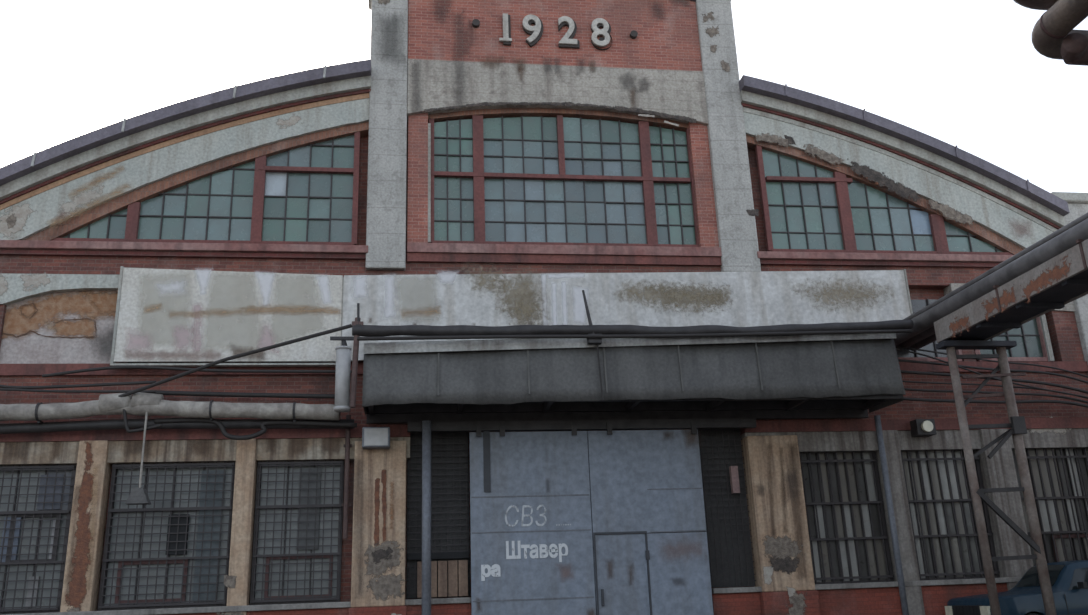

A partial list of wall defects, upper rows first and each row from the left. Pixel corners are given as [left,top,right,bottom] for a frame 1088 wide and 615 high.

spalling [702,12,730,72]
spalling [755,133,975,225]
peeling [0,204,34,239]
peeling [2,273,118,339]
rust [981,255,1072,321]
peeling [65,441,95,612]
flaking render [364,470,405,601]
flaking render [762,535,807,615]